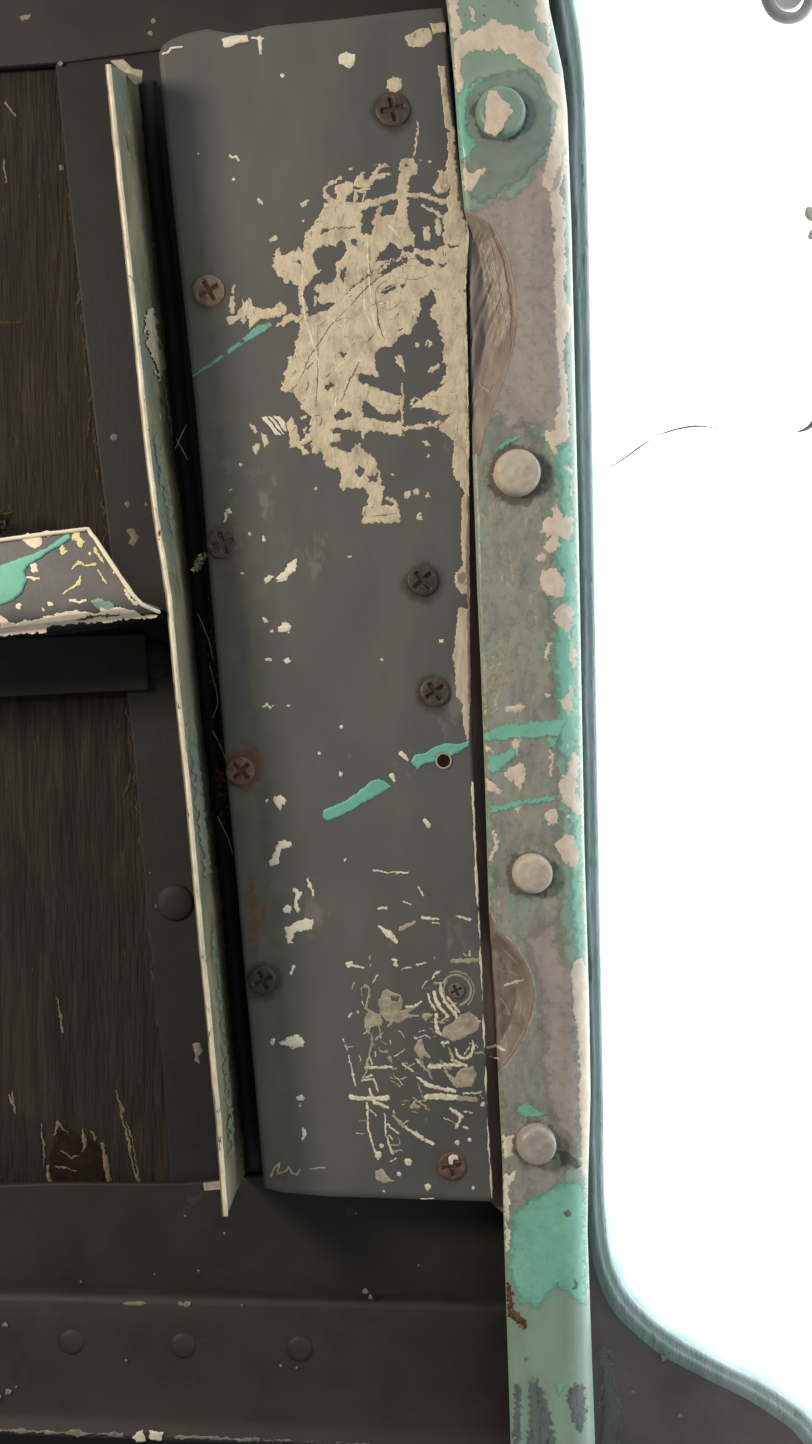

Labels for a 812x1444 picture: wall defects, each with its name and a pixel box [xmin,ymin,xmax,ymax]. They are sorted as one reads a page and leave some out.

peeling [0,528,157,637]
peeling [222,0,590,1252]
rust [506,1282,527,1330]